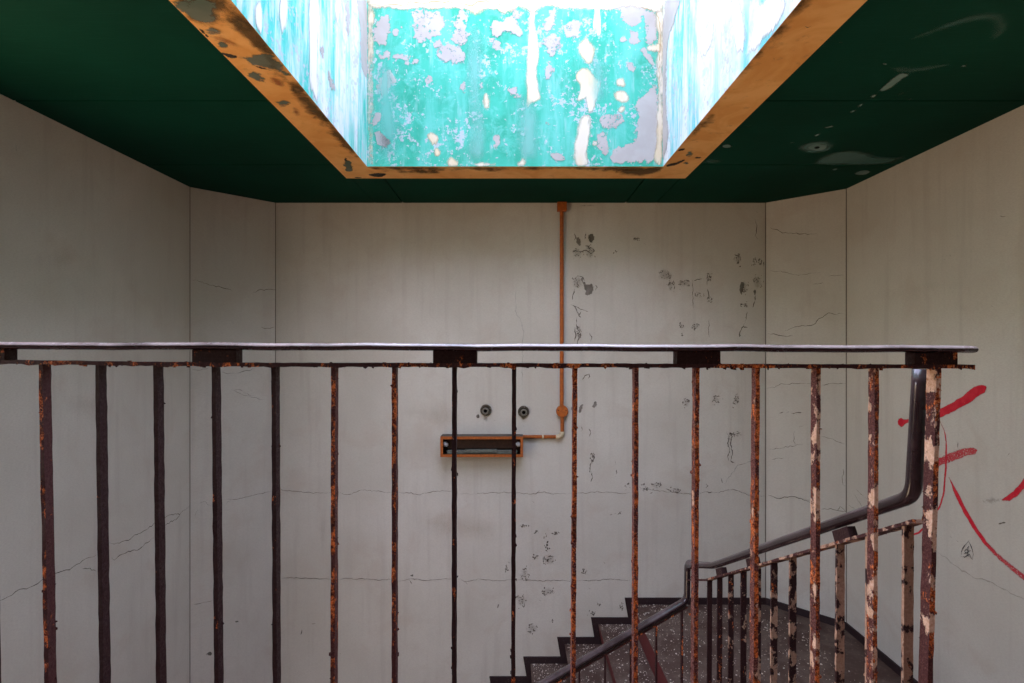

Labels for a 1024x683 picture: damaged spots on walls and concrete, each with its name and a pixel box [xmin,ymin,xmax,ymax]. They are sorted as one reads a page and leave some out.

peeling [173,0,386,178]
peeling [345,0,471,96]
peeling [487,9,523,50]
peeling [541,7,582,80]
peeling [594,0,701,167]
peeling [371,113,391,148]
spalling [573,234,595,256]
spalling [572,276,597,300]